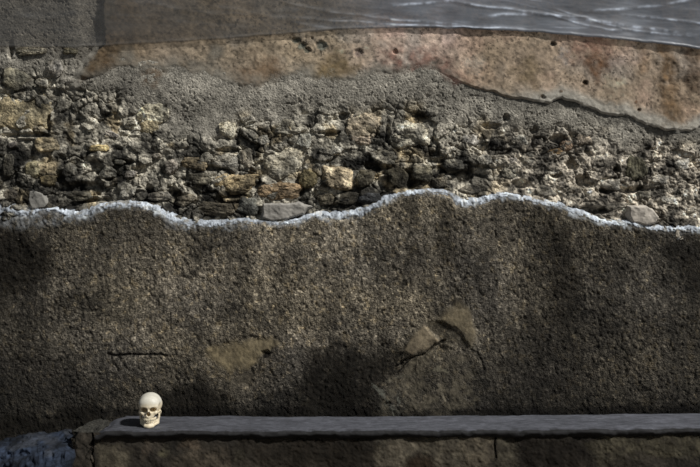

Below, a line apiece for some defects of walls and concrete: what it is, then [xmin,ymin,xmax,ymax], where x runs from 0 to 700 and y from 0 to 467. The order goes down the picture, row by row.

flaking render [0,0,700,240]
crack [108,349,178,365]
flaking render [208,340,273,368]
crack [396,340,453,372]